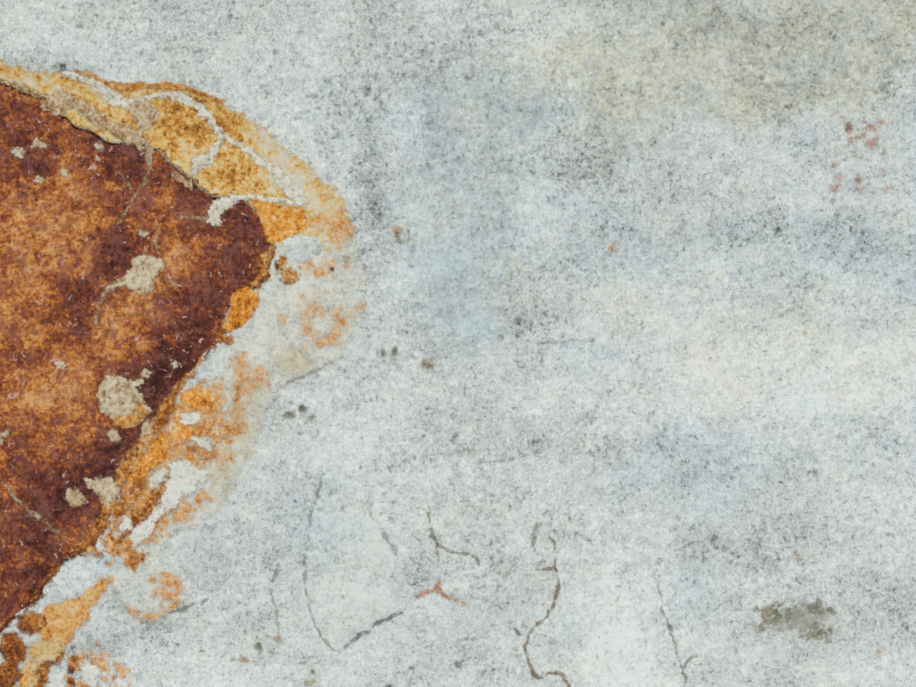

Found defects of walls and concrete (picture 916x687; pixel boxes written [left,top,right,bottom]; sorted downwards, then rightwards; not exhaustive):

flaking render [79,661,100,687]
rust [0,200,367,687]
spalling [0,61,368,632]
crack [514,539,571,687]